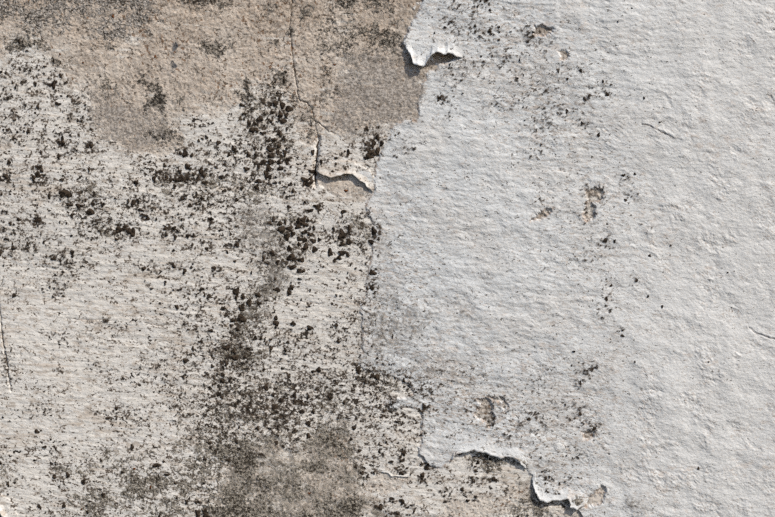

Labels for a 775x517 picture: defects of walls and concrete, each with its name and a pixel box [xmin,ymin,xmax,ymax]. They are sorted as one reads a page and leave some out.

peeling [0,0,463,159]
crack [283,0,335,185]
leakage [0,0,585,517]
peeling [316,161,374,200]
peeling [215,430,411,517]
peeling [419,439,607,517]